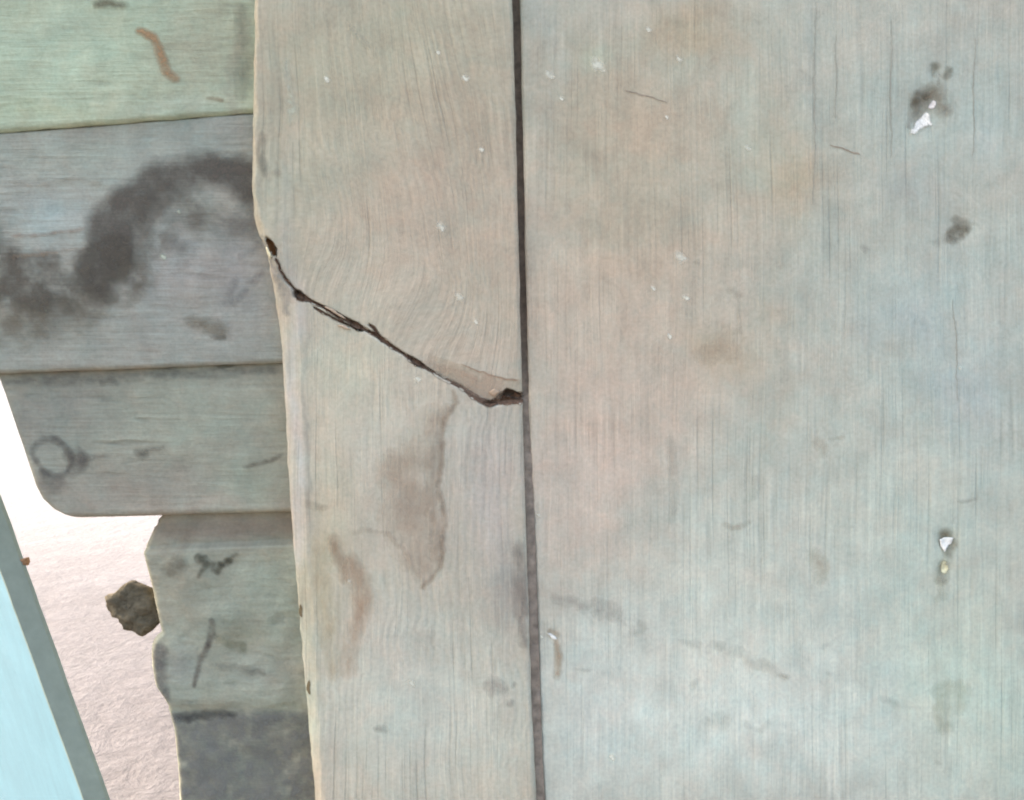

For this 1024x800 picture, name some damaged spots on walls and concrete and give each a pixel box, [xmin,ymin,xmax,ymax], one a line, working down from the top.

corrosion [137,29,176,80]
damp [0,156,254,330]
crack [275,258,523,407]